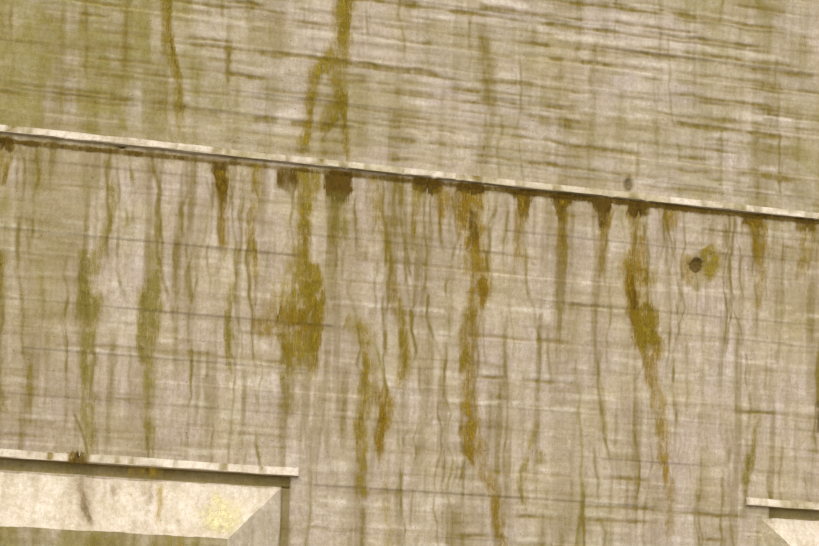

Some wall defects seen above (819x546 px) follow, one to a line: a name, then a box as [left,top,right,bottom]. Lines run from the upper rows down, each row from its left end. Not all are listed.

water stain [306,0,352,125]
water stain [0,135,13,150]
water stain [511,190,533,222]
water stain [550,194,572,220]
water stain [592,198,612,235]